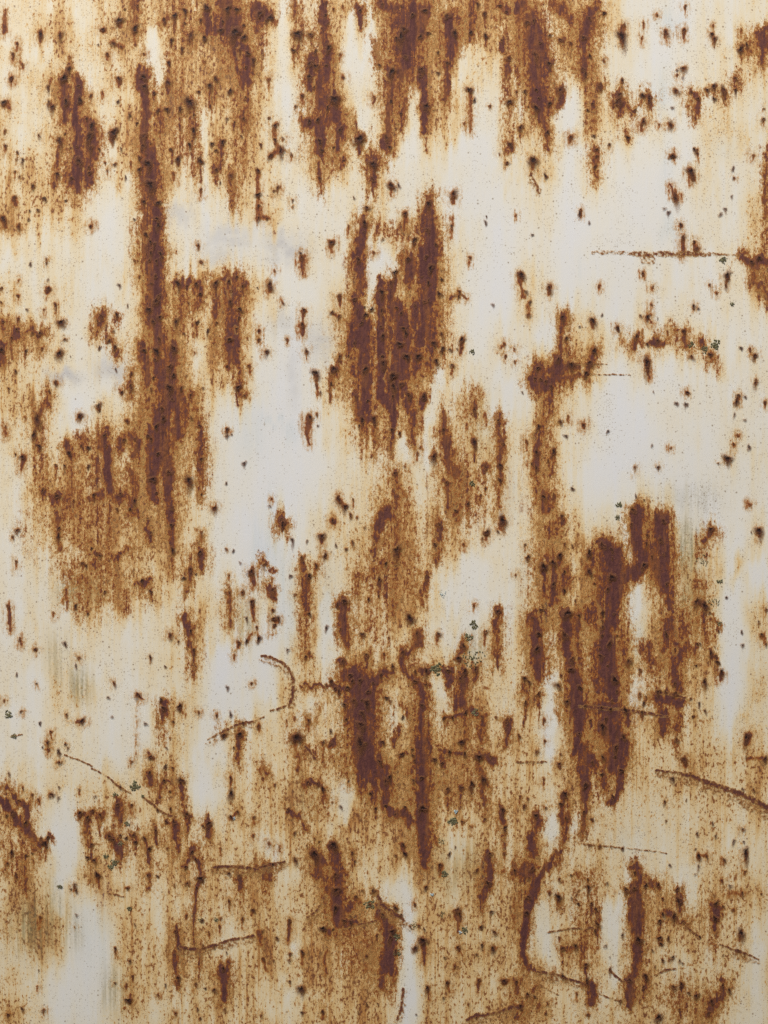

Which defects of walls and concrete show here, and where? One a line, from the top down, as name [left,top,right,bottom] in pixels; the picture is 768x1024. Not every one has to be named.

corrosion [670,20,768,129]
corrosion [708,142,768,313]
corrosion [0,0,284,684]
corrosion [254,0,728,1024]
corrosion [0,772,60,903]
corrosion [74,692,285,1012]
corrosion [617,827,749,1024]